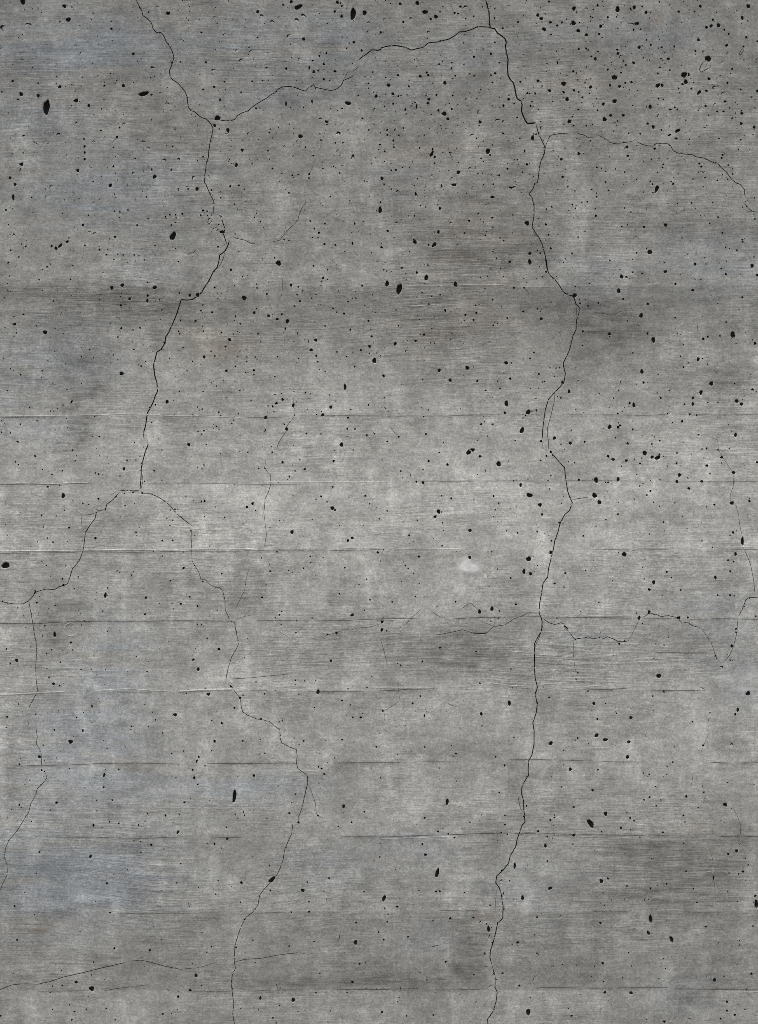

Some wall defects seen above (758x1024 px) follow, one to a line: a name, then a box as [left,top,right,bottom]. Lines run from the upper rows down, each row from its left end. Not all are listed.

crack [23,0,758,710]
crack [0,720,49,890]
crack [0,953,213,990]
crack [225,570,318,1024]
crack [487,454,629,1024]